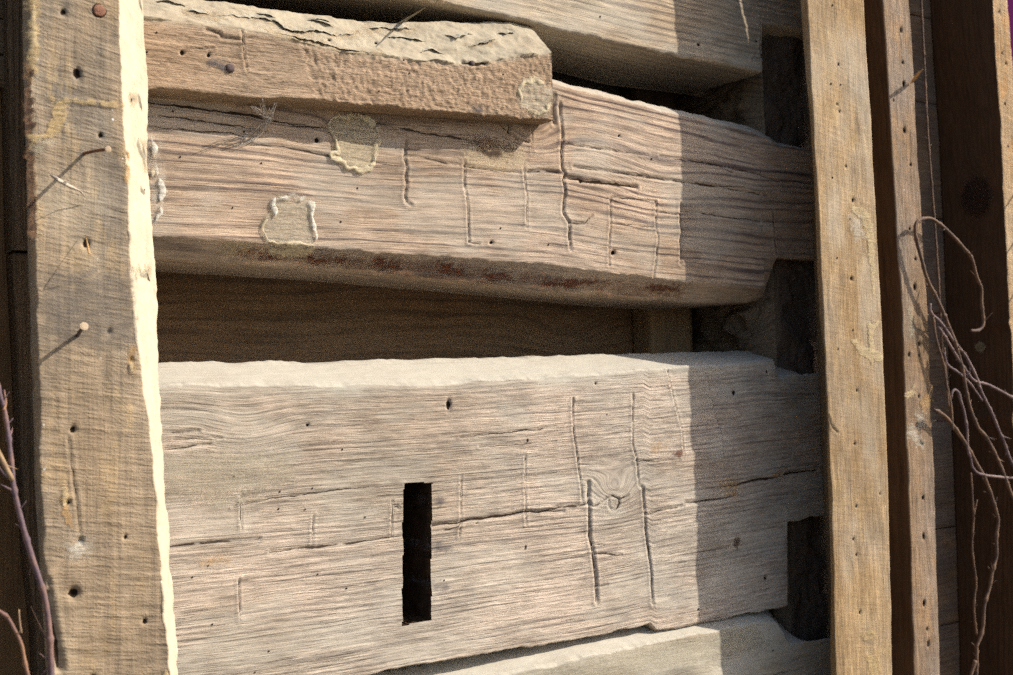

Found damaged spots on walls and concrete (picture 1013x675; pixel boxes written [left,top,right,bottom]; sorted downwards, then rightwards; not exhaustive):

crack [363,96,776,277]
crack [433,399,814,603]